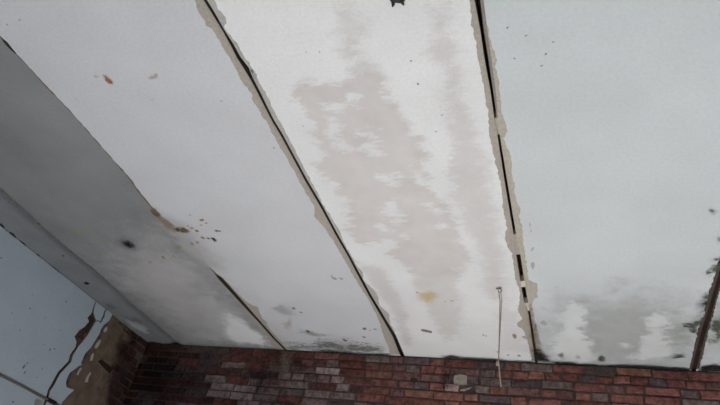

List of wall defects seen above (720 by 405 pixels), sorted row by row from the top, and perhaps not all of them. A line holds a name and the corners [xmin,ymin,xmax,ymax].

crack [0,188,178,404]
corrosion [149,206,220,259]
peeling [62,216,317,405]
water stain [234,305,390,405]
peeling [287,0,476,347]
water stain [436,257,720,390]